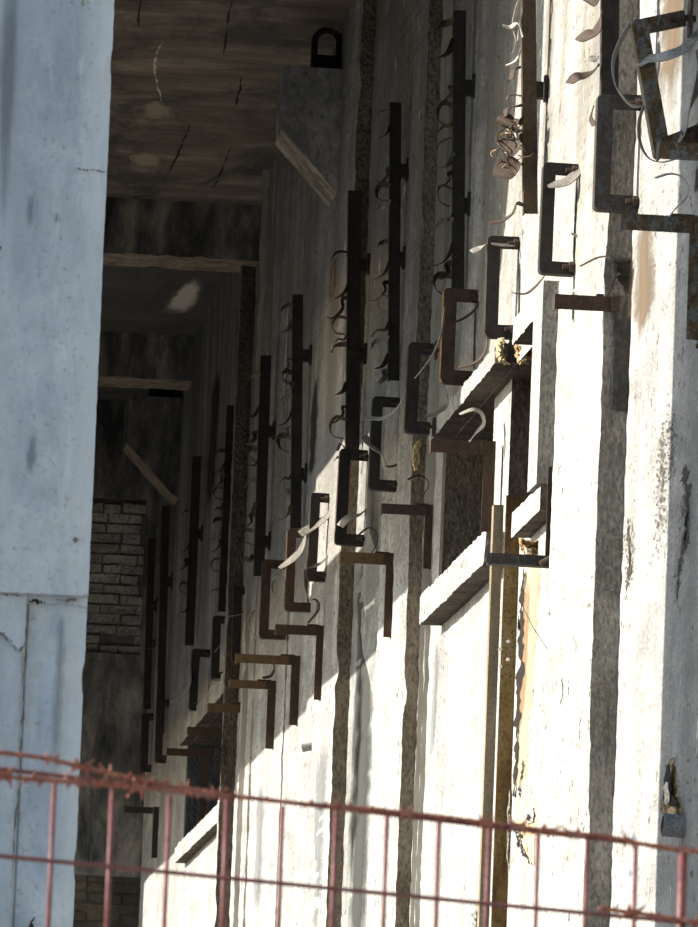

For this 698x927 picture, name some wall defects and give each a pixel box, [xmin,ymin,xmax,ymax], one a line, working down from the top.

leakage [2,11,14,157]
crack [0,593,77,872]
peeling [506,787,536,875]
hole [660,753,686,817]